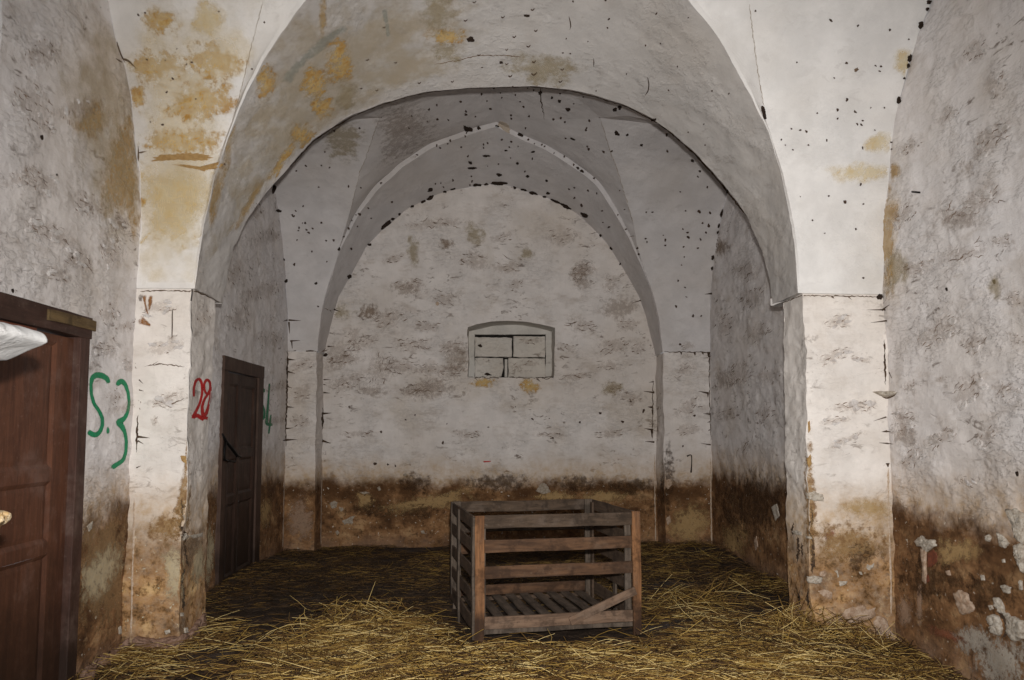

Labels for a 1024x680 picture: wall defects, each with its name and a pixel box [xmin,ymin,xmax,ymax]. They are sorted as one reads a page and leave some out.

leakage [300,38,352,119]
leakage [102,3,243,236]
leakage [345,475,524,517]
leakage [535,476,646,502]
leakage [79,502,126,631]
leakage [164,528,214,598]
flaking render [791,506,847,610]
flaking render [842,605,894,640]
flaking render [914,535,951,584]
leakage [897,539,1024,680]
flaking render [953,590,975,615]
flaking render [984,508,1024,641]